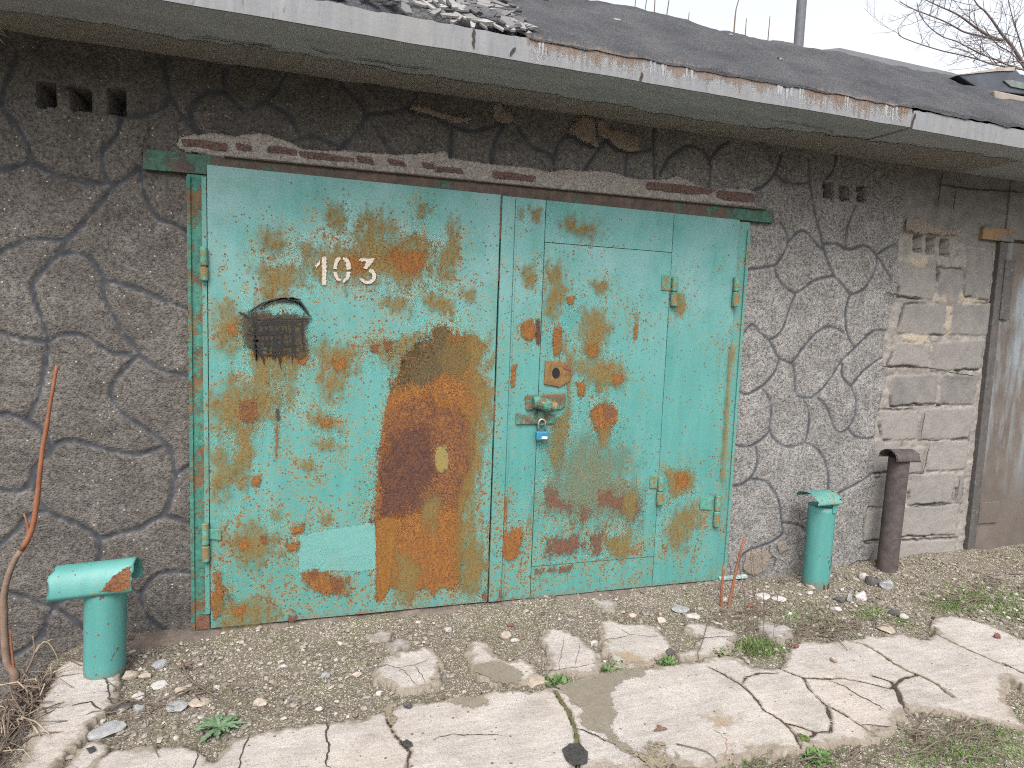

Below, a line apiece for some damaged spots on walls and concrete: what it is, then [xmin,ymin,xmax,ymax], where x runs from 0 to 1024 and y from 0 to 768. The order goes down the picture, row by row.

spalling [176,133,756,208]
spalling [570,115,640,152]
corrosion [203,201,495,605]
corrosion [502,260,647,562]
corrosion [721,344,735,480]
corrosion [662,468,709,549]
corrosion [99,566,132,592]
crack [926,627,1024,674]
crack [324,722,332,768]
crack [387,721,411,768]
crack [533,643,645,768]
crack [709,642,952,748]